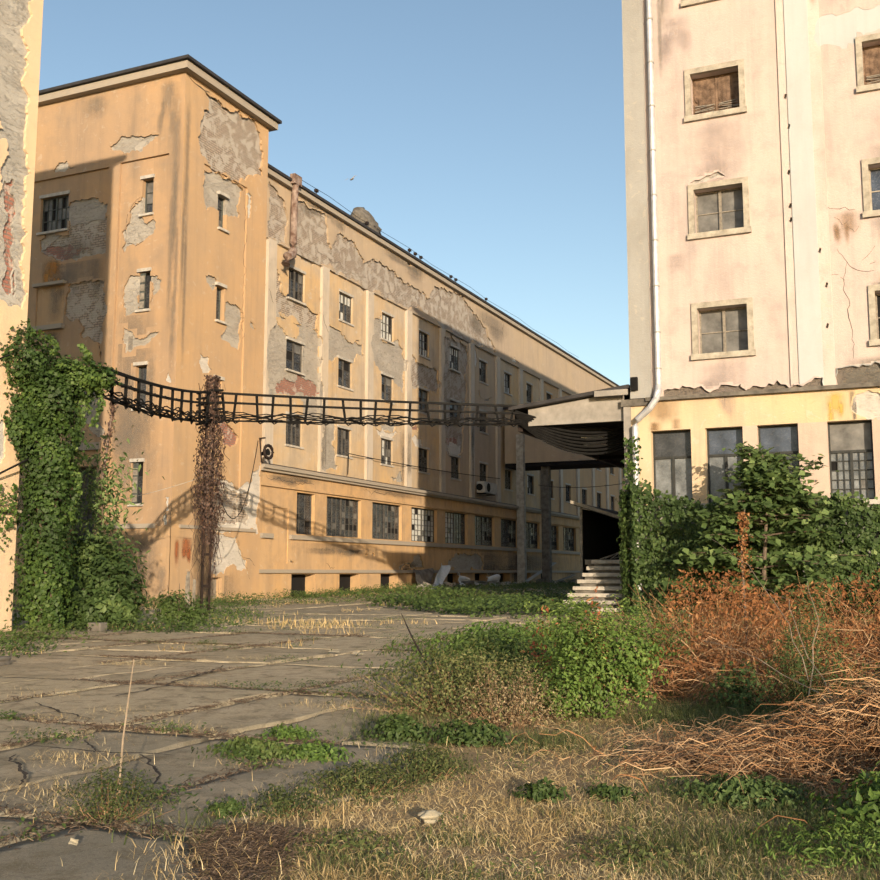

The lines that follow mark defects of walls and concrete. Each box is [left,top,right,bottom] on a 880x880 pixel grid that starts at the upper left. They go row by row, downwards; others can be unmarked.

spalling [0,0,31,308]
spalling [40,196,107,261]
flaking render [66,278,107,344]
spalling [122,273,159,353]
spalling [151,274,161,301]
flaking render [198,91,495,471]
crack [832,246,875,358]
spalling [664,376,823,396]
spalling [835,361,880,421]
rust [175,539,191,559]
spalling [211,464,260,576]
crack [0,745,29,785]